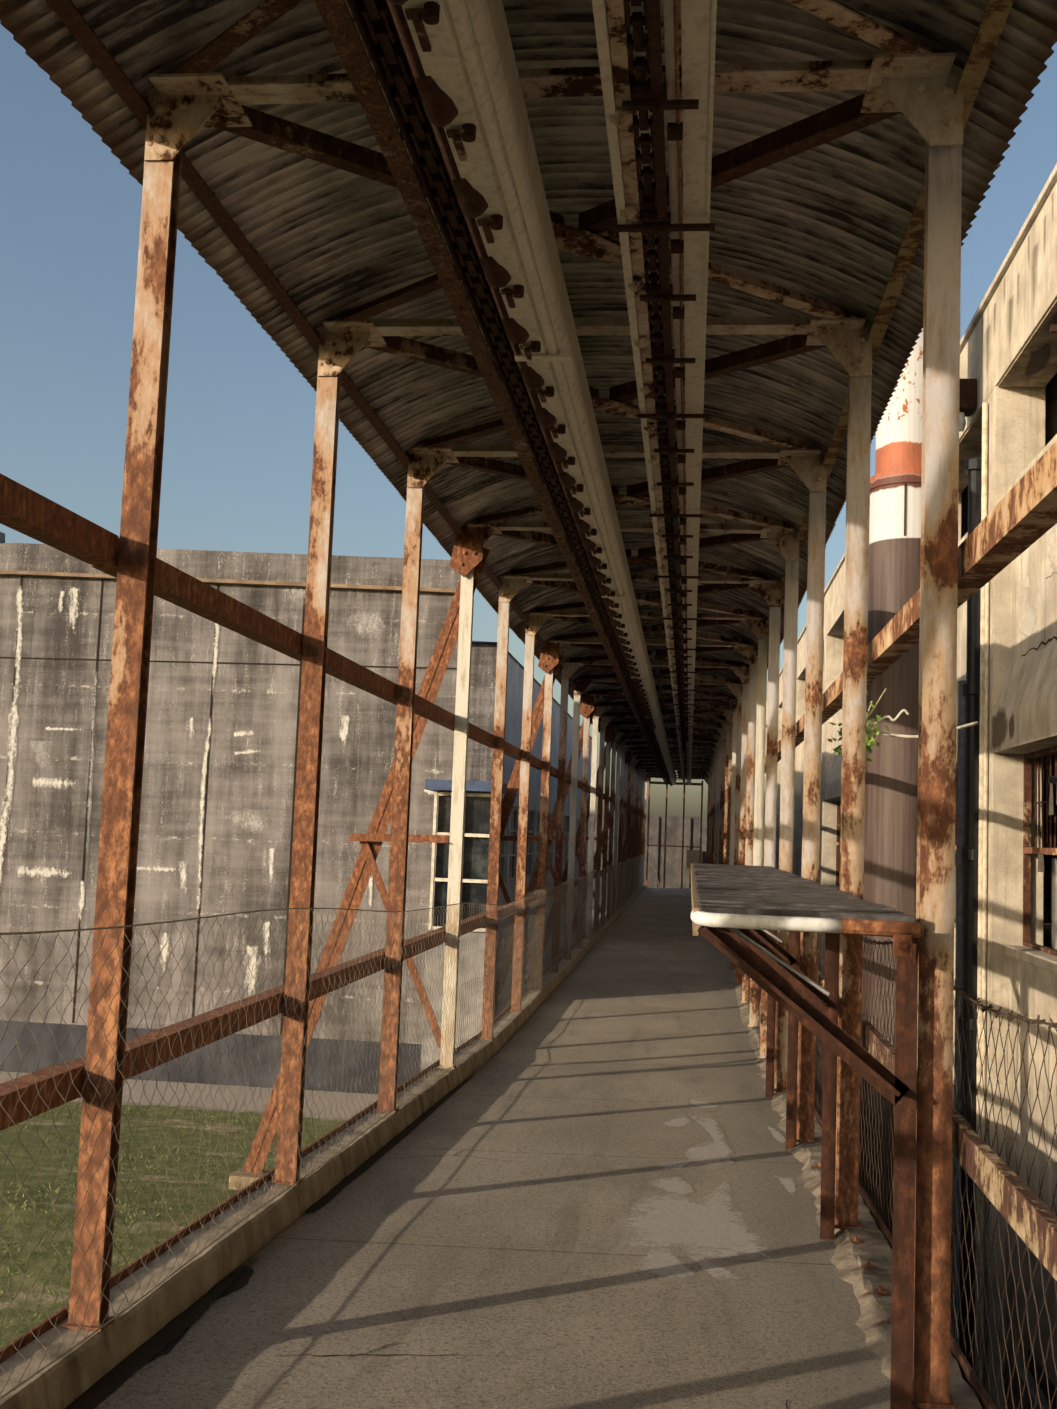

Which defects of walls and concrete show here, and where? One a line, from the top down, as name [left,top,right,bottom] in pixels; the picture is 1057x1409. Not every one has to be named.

leakage [0,587,84,919]
leakage [37,677,97,777]